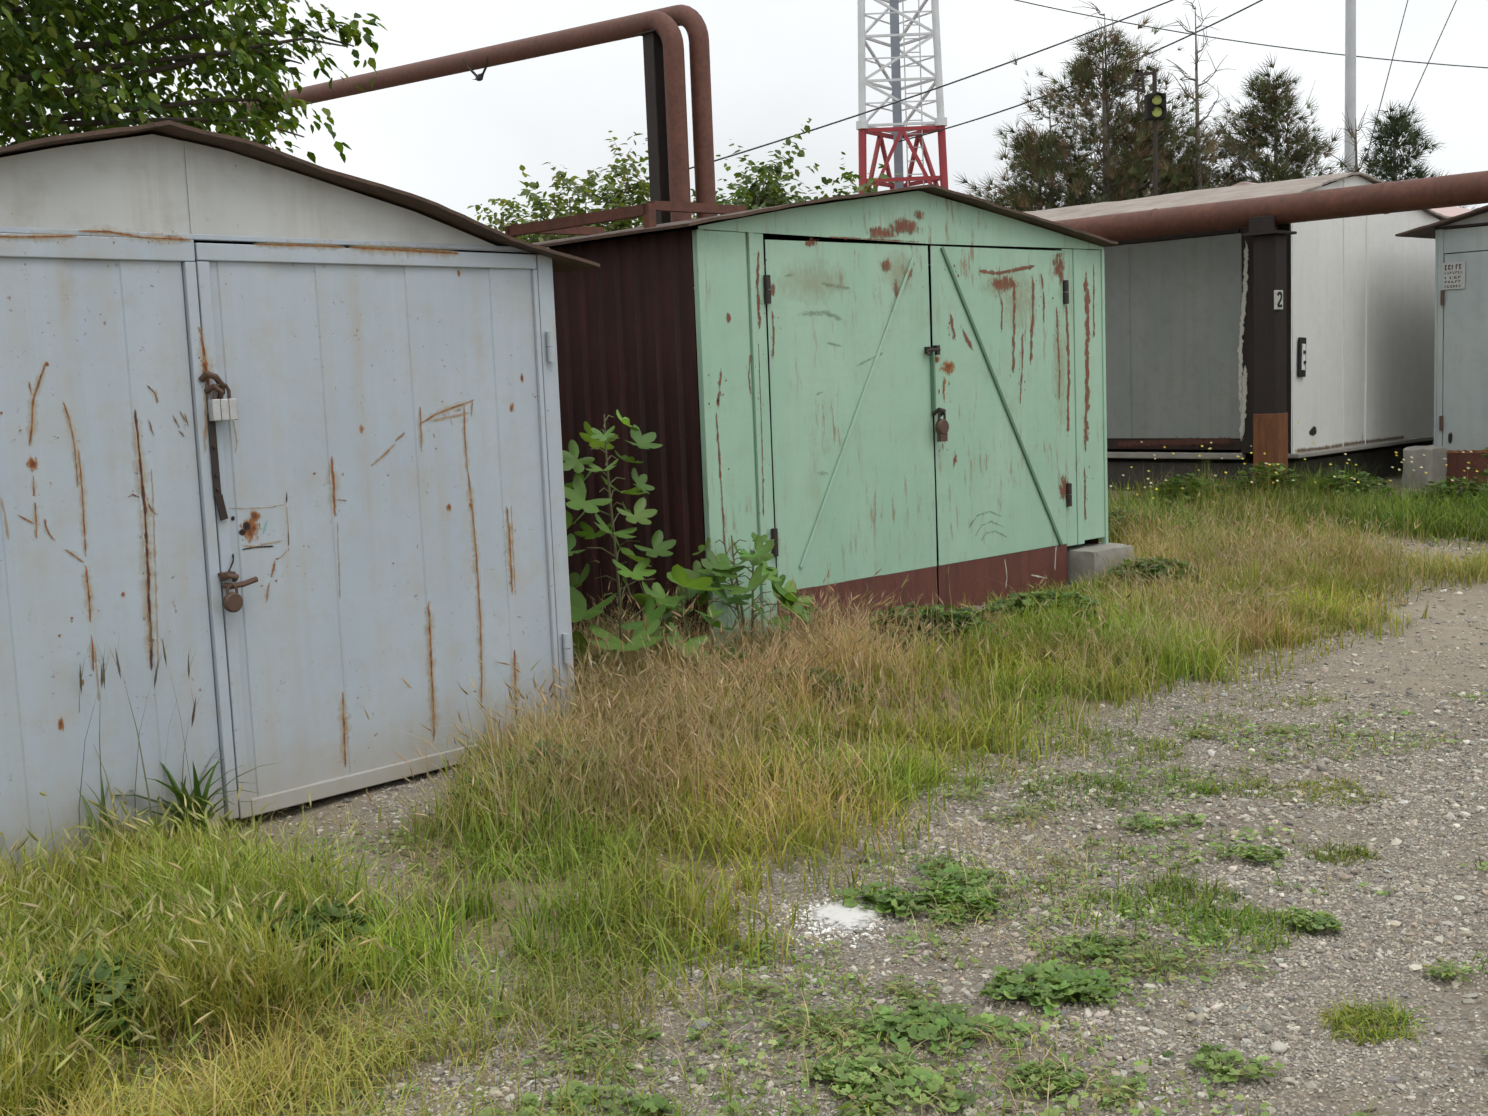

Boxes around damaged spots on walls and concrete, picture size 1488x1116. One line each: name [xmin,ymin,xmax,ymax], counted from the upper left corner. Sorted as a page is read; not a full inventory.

corrosion [27,362,49,527]
corrosion [63,402,99,698]
corrosion [129,411,159,670]
corrosion [231,505,289,603]
corrosion [425,603,436,739]
corrosion [396,400,483,704]